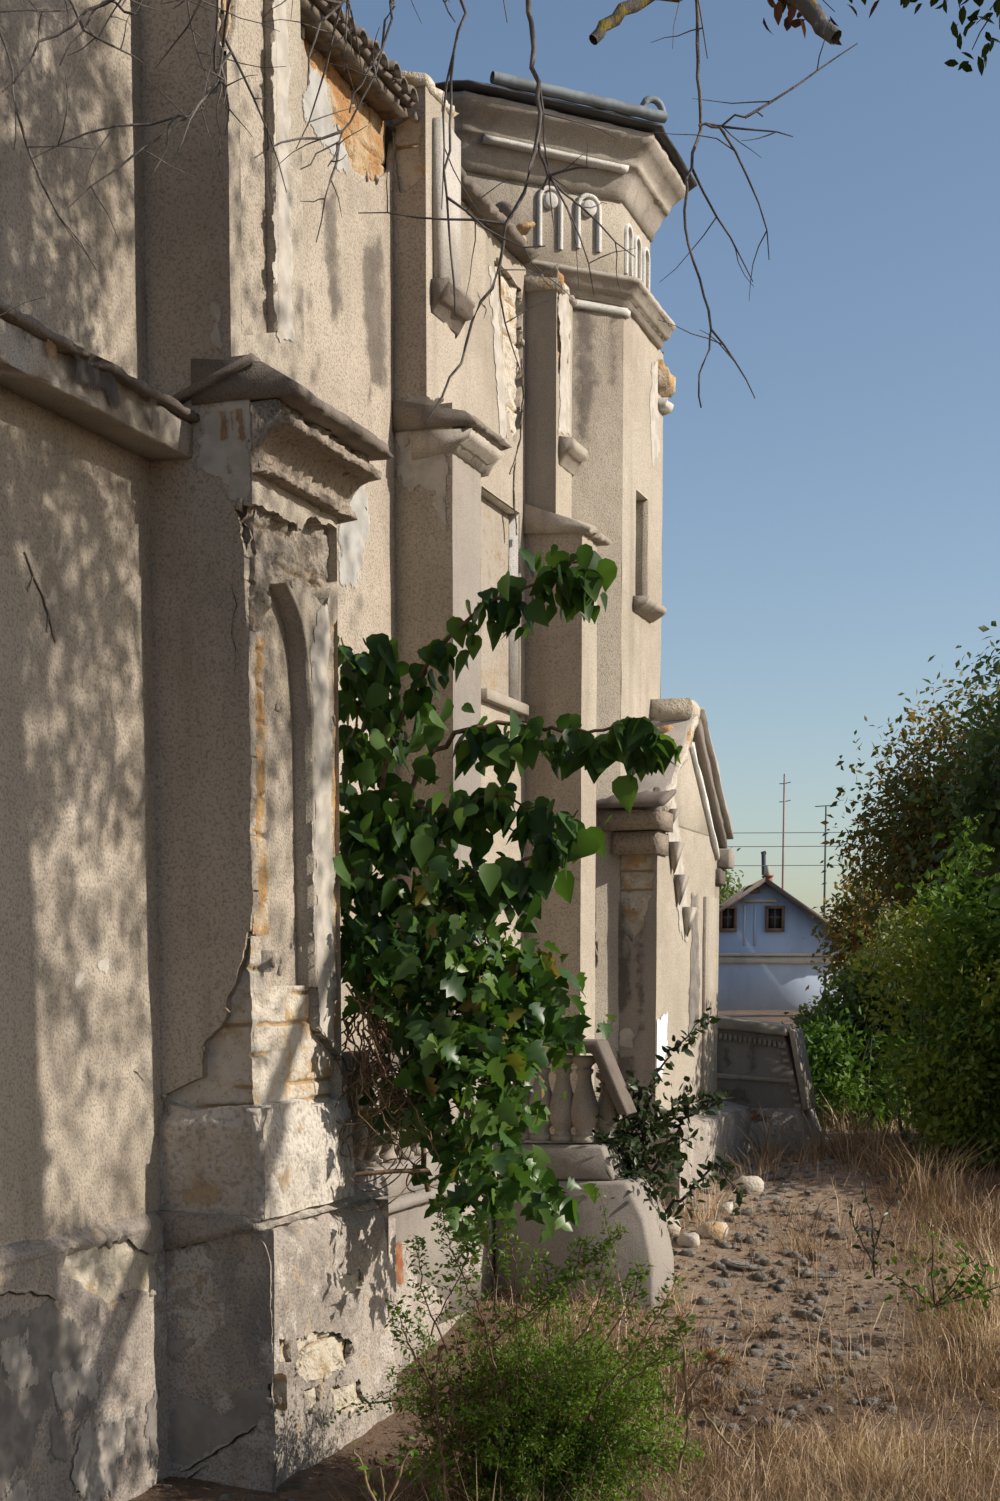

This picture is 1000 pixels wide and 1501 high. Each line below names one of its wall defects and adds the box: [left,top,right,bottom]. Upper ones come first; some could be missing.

peeling [271,0,424,342]
spalling [489,257,525,440]
spalling [160,399,370,1110]
spalling [621,855,655,941]
peeling [669,796,688,941]
spalling [61,1232,158,1303]
spalling [337,1271,364,1294]
spalling [263,1327,368,1419]
crack [180,1423,265,1479]